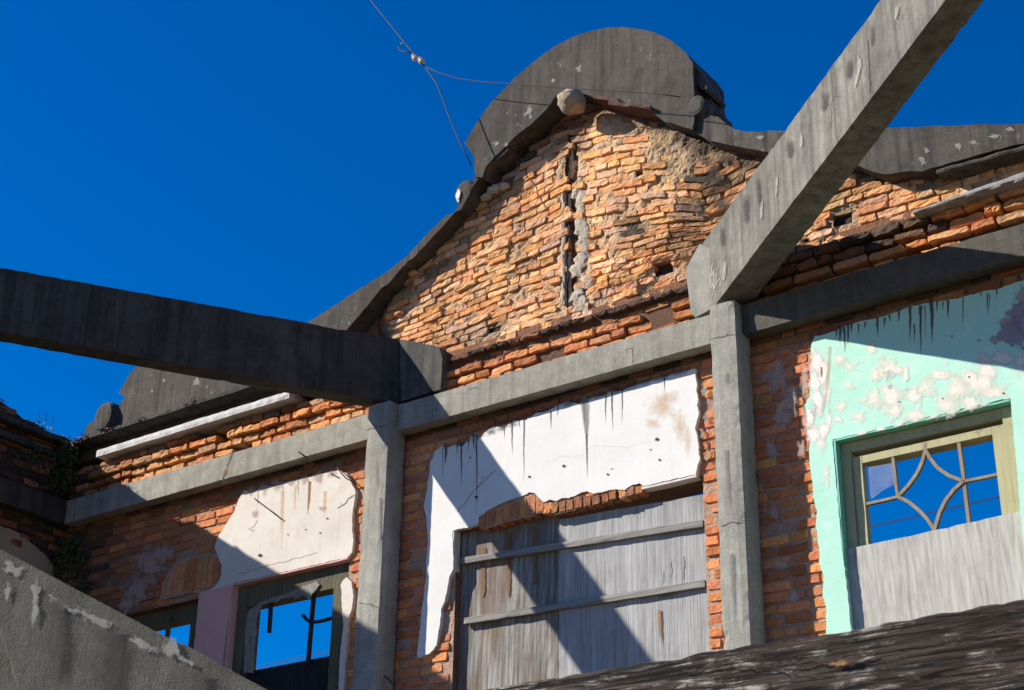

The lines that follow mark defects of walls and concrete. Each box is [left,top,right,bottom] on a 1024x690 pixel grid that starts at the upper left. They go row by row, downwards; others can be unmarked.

crack [556,125,590,313]
leakage [836,300,949,346]
peeling [761,287,1024,456]
leakage [442,415,525,486]
leakage [550,379,650,462]
flaking render [480,484,649,532]
peeling [4,561,24,599]
peeling [31,582,111,628]
flaking render [118,545,222,613]
peeling [128,636,193,666]